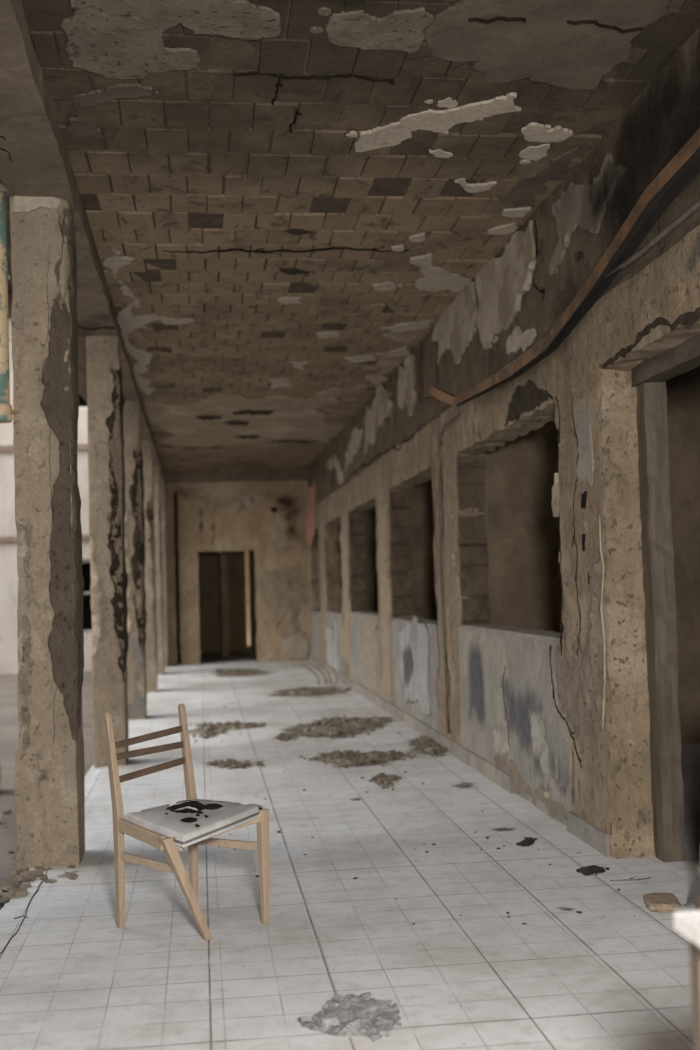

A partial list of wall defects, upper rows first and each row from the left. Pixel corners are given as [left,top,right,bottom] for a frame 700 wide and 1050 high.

flaking render [61,0,281,79]
flaking render [310,0,669,152]
spalling [599,307,700,368]
spalling [10,196,109,761]
flaking render [102,122,623,727]
leakage [470,651,484,721]
leakage [494,685,580,802]